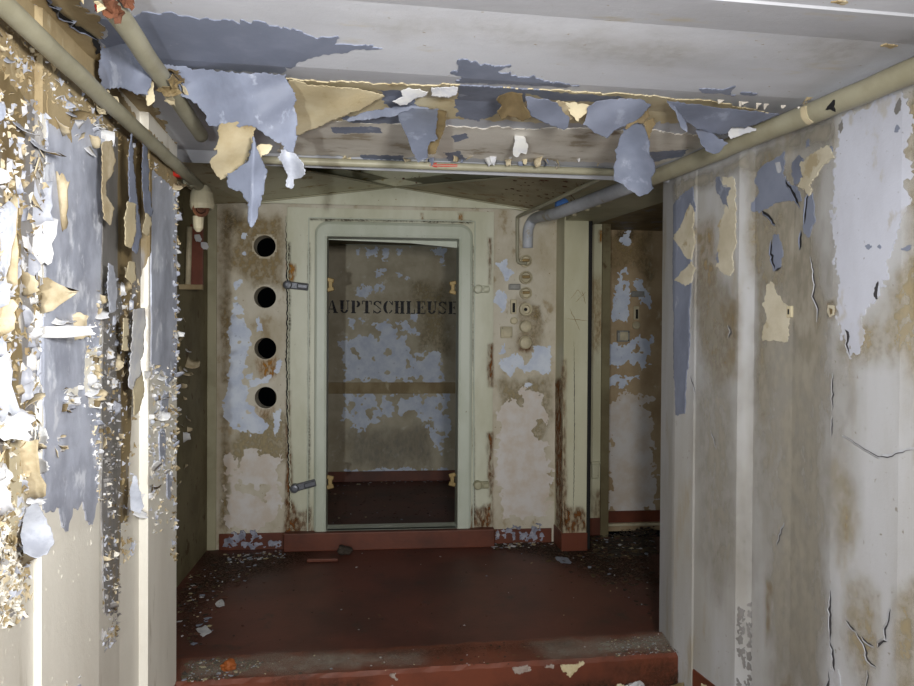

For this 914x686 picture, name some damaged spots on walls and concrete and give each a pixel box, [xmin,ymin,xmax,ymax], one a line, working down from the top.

peeling [133,11,768,169]
peeling [751,91,914,359]
peeling [0,0,200,632]
peeling [222,279,283,437]
peeling [221,448,284,550]
corrosion [286,429,312,531]
corrosion [471,504,492,527]
corrosion [555,367,586,533]
peeling [608,334,660,511]
damp [853,327,874,356]
crack [830,373,914,459]
damp [886,260,914,363]